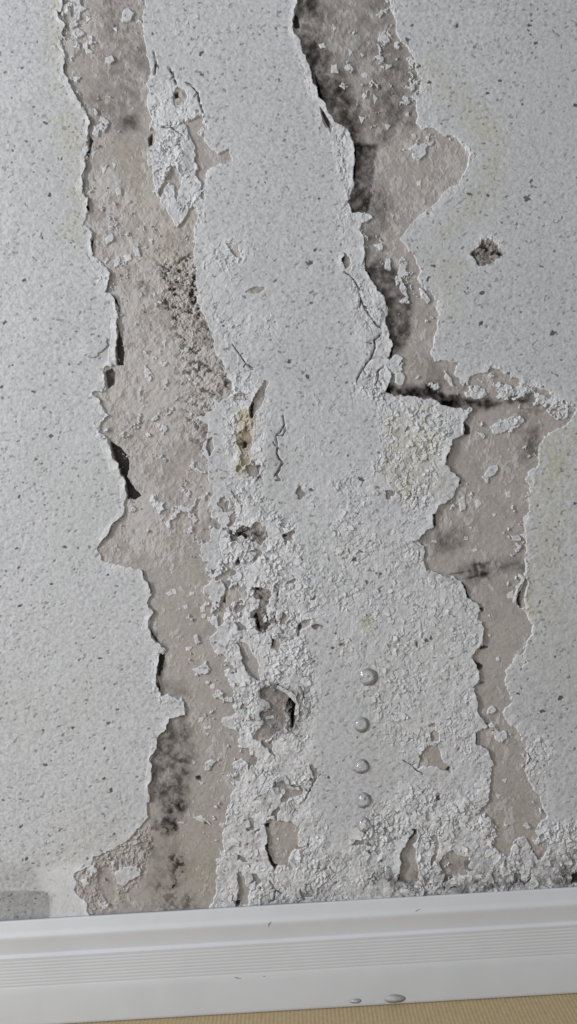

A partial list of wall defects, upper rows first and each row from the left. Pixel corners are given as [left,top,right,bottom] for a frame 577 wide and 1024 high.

leakage [305,41,374,212]
leakage [368,266,410,346]
peeling [52,0,324,915]
leakage [386,385,472,404]
peeling [288,0,577,896]